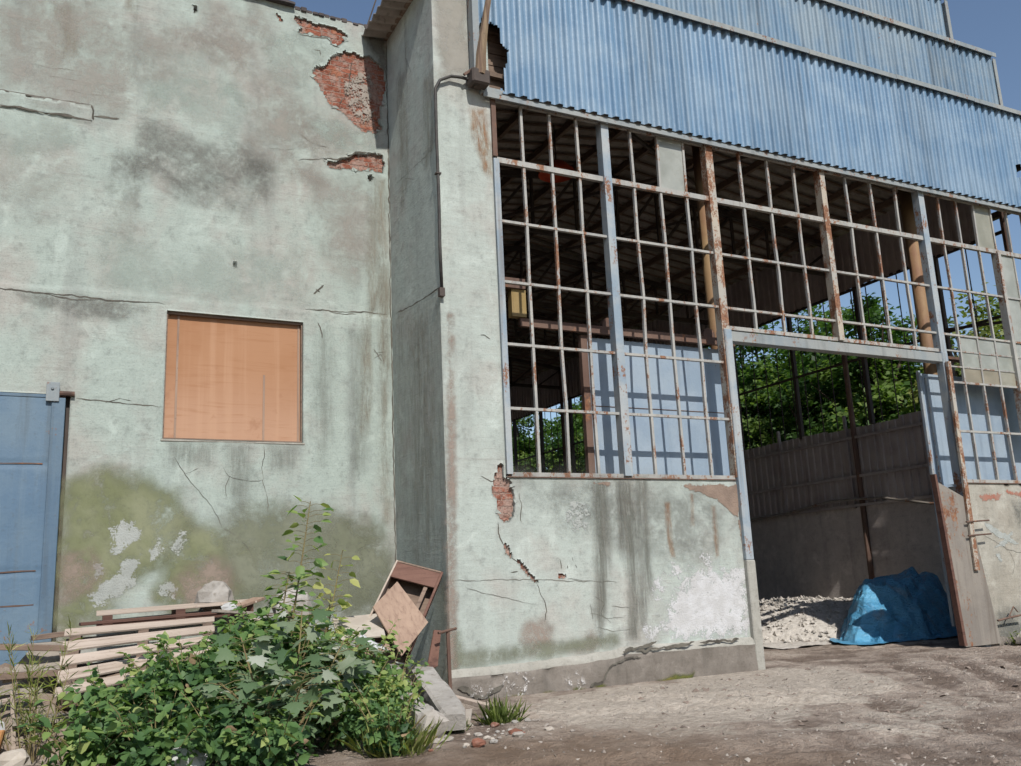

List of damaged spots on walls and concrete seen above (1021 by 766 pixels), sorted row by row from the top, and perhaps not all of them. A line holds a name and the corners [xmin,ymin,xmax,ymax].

flaking render [294,15,386,134]
flaking render [324,152,384,173]
crack [0,288,166,305]
crack [174,445,269,557]
flaking render [492,464,517,522]
leakage [64,518,188,608]
leakage [157,562,230,603]
crack [455,497,739,687]
leakage [566,482,750,642]